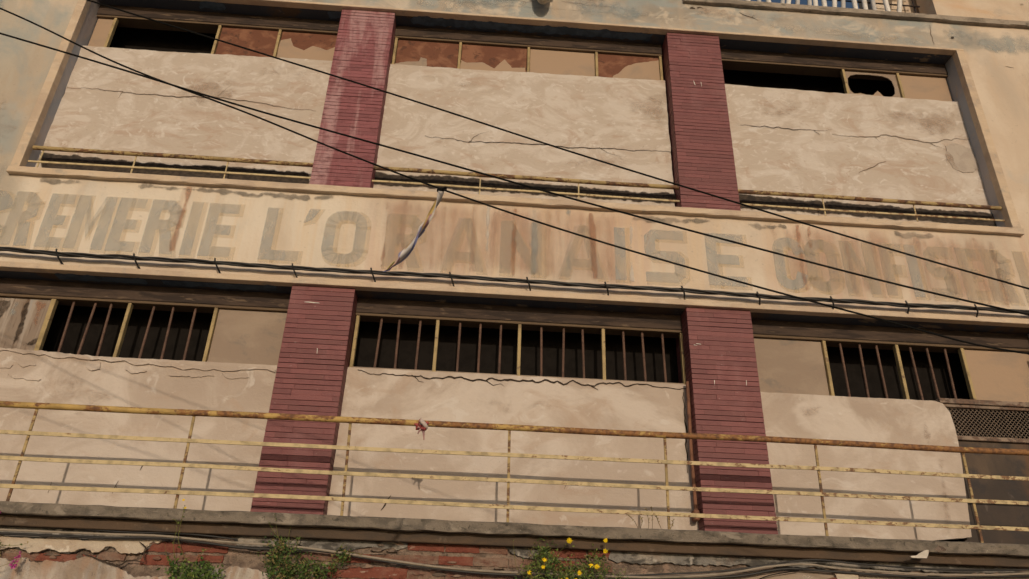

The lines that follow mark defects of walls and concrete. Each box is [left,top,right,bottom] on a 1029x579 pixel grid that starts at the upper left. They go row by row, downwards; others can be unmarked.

crack [749,125,959,173]
flaking render [0,348,276,381]
crack [360,370,688,473]
flaking render [0,537,252,578]
flaking render [265,541,622,579]
flaking render [828,571,860,579]